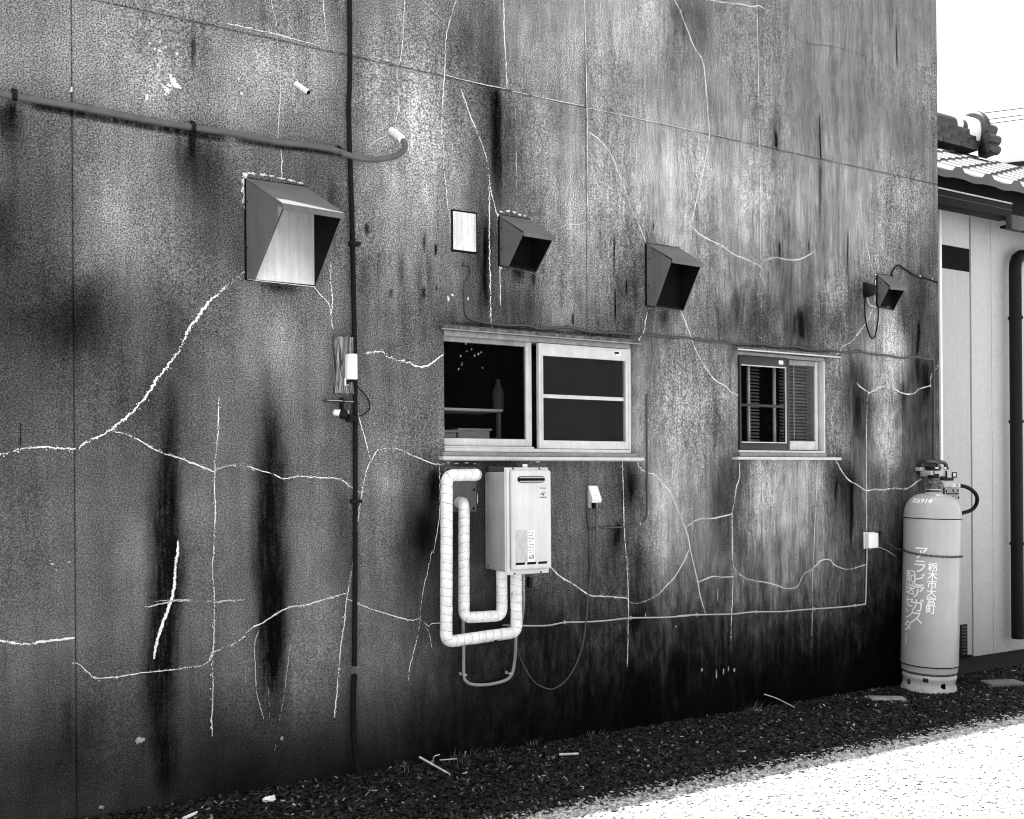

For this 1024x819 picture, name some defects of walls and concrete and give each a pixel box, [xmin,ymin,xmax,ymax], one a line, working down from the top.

damp [492,91,501,184]
crack [369,0,816,322]
damp [147,416,183,787]
crack [0,265,443,737]
damp [254,420,286,697]
crack [550,309,939,667]